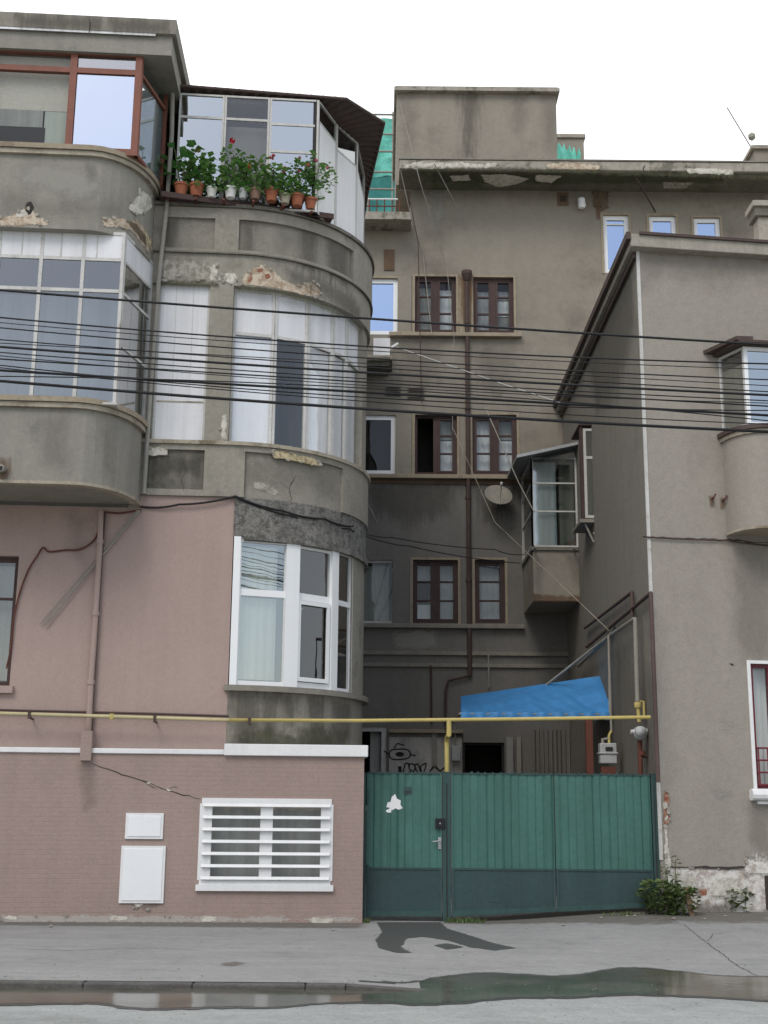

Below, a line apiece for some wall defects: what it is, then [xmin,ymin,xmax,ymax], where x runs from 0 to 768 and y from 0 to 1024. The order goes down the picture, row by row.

spalling [401,161,601,187]
spalling [663,168,733,189]
flaking render [0,206,49,227]
flaking render [102,187,153,255]
flaking render [221,264,322,298]
peeling [271,449,322,466]
crack [92,763,199,799]
flaking render [663,790,768,913]